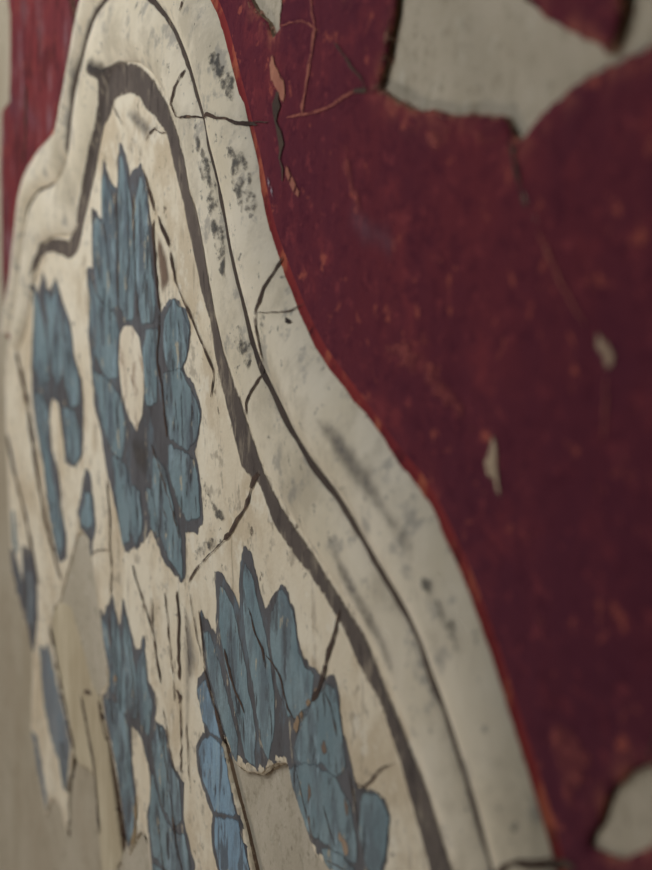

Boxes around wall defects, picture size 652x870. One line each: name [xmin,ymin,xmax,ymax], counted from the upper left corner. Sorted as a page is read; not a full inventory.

crack [146,0,367,181]
flaking render [248,0,282,39]
flaking render [373,0,652,139]
crack [103,170,214,540]
crack [245,256,303,412]
crack [6,352,62,584]
spalling [485,438,499,493]
flaking render [62,534,109,695]
crack [91,472,259,870]
crack [311,610,340,736]
flaking render [229,747,329,870]
flaking render [588,765,652,861]